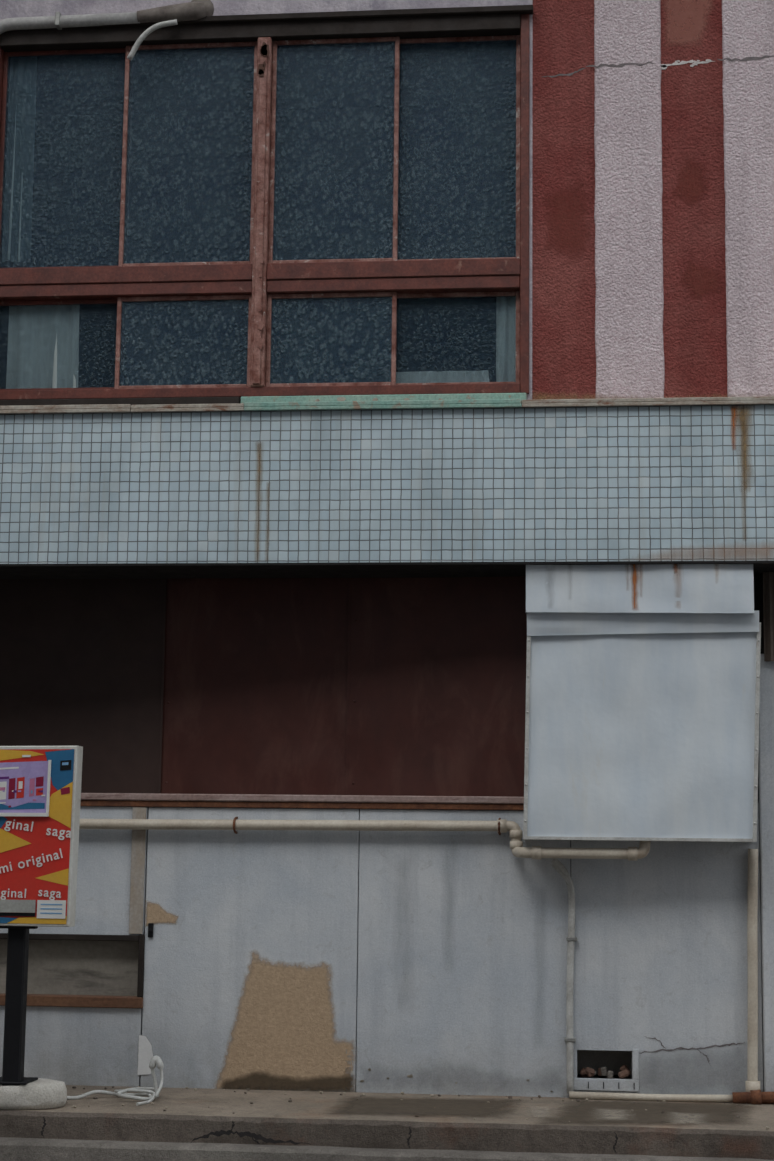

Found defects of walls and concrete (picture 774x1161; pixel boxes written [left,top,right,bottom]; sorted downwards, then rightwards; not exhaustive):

crack [543,55,773,78]
rust [732,407,748,483]
flaking render [217,952,371,1089]
crack [640,1036,745,1066]